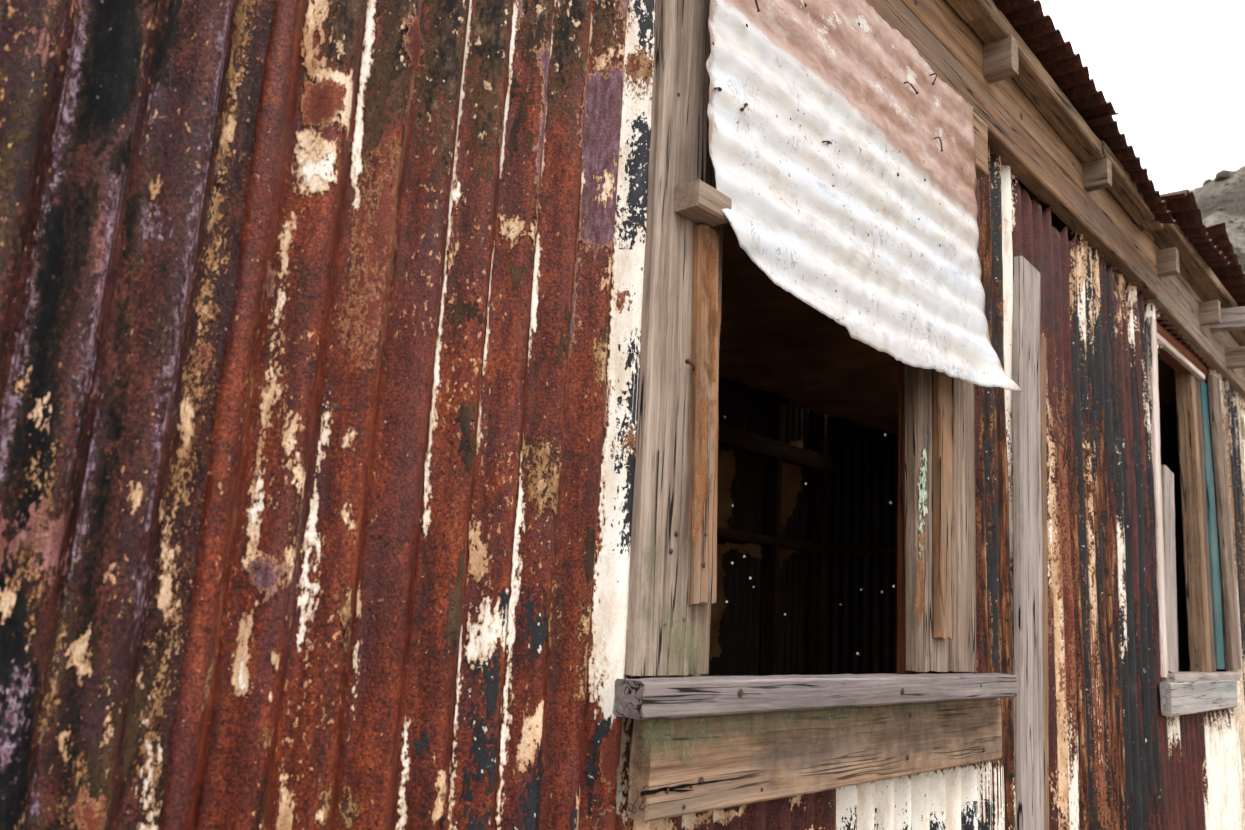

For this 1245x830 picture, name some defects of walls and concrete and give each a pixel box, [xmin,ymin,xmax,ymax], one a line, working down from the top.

peeling [25,610,93,762]
rust [37,751,113,830]
peeling [90,0,263,830]
rust [234,540,293,604]
rust [265,261,284,304]
peeling [234,211,362,720]
peeling [291,0,414,211]
rust [337,8,425,383]
peeling [395,0,747,830]
peeling [1046,371,1079,830]
rust [1048,284,1131,830]
peeling [1202,705,1245,830]